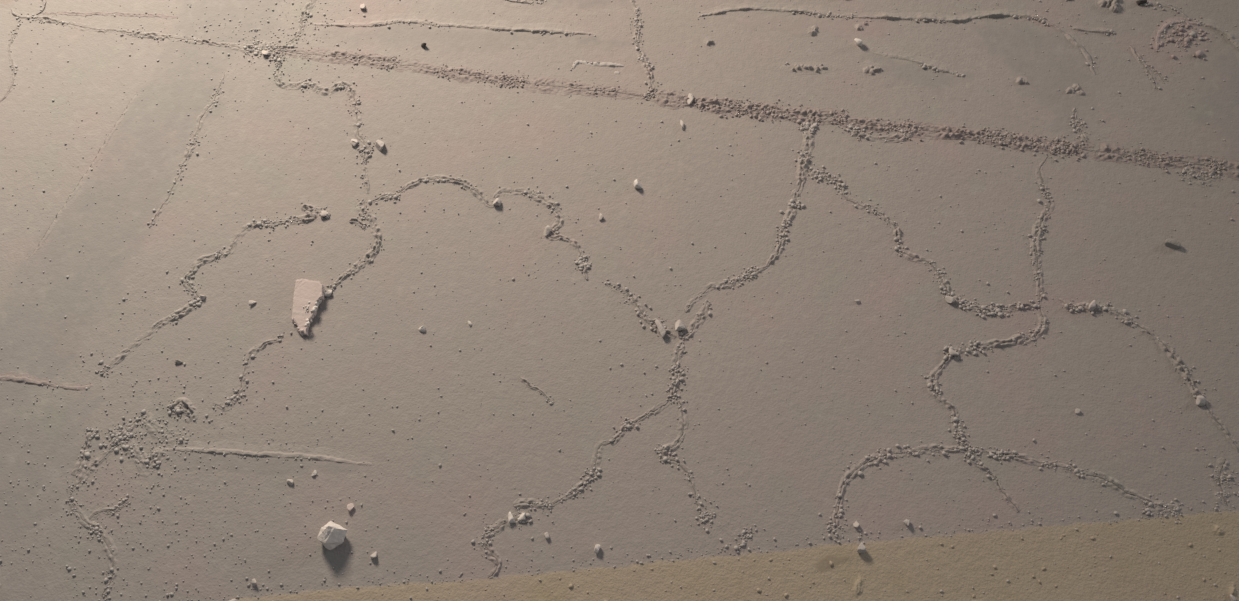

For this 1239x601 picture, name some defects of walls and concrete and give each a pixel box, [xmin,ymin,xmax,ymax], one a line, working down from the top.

crack [0,19,23,102]
crack [23,0,1239,313]
crack [65,334,283,599]
crack [95,204,331,377]
crack [471,279,757,579]
crack [826,156,1182,541]
crack [1058,298,1239,506]